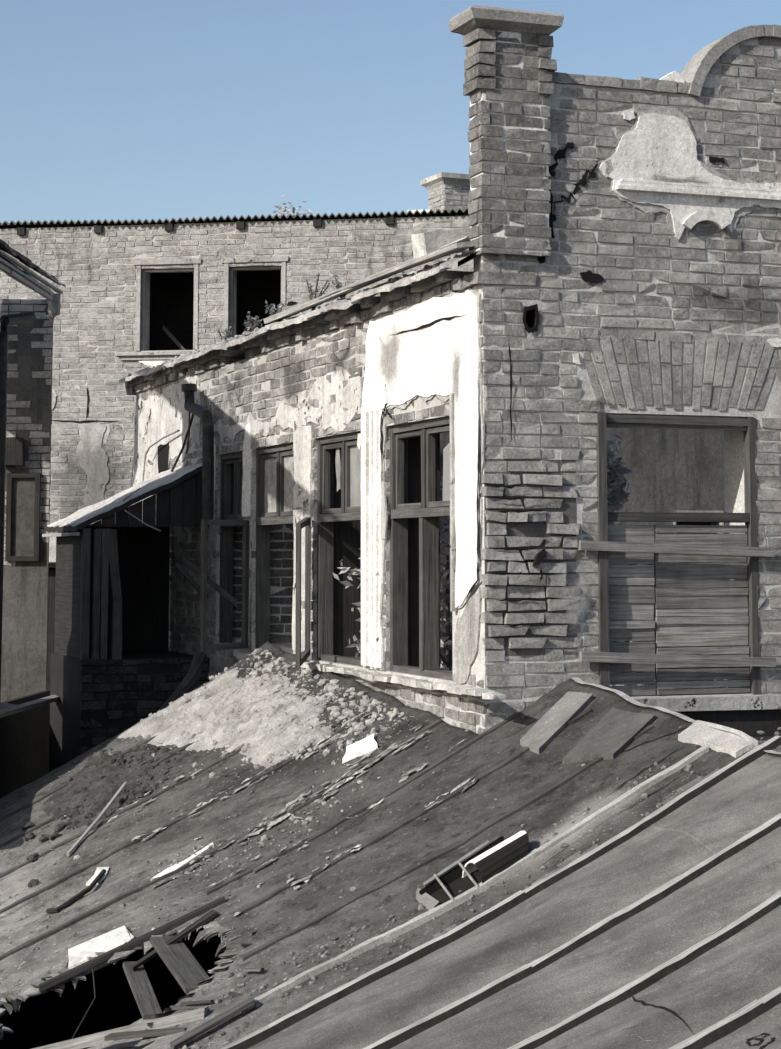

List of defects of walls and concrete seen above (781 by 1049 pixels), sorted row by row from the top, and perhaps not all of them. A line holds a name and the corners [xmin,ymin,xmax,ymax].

crack [549,142,599,240]
flaking render [599,106,781,241]
crack [391,315,464,335]
spalling [523,304,540,333]
spalling [580,270,604,283]
crack [506,345,514,441]
flaking render [131,287,485,684]
crack [466,367,480,601]
crack [539,727,688,867]
crack [631,996,694,1034]